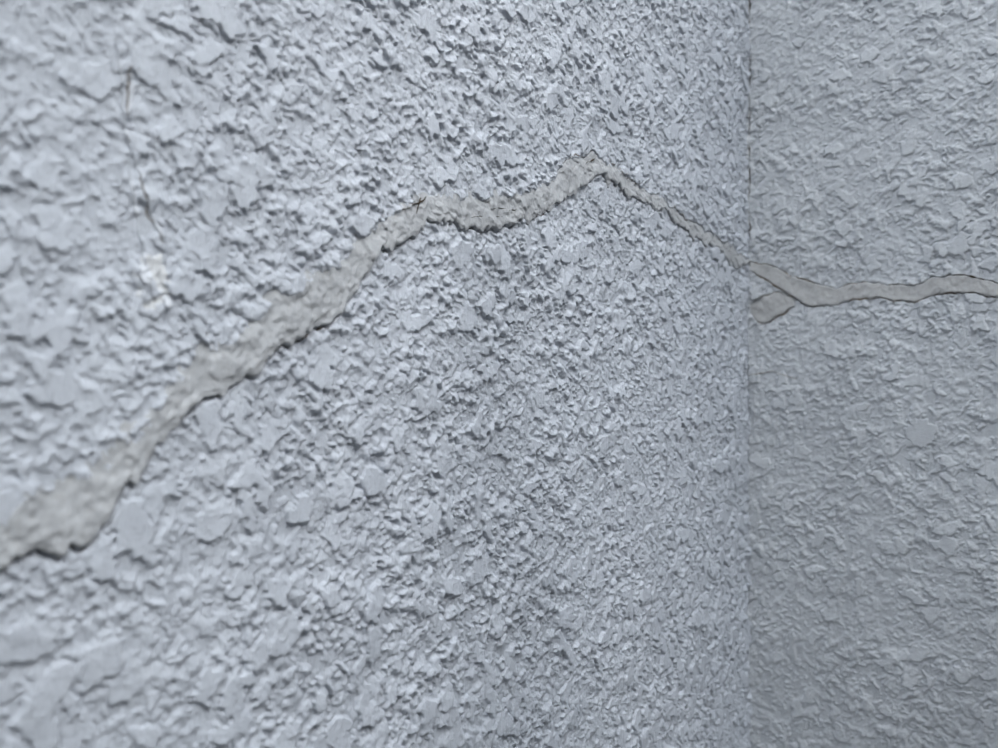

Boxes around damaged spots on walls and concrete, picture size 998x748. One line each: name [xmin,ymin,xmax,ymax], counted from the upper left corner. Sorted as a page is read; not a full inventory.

crack [0,42,998,570]